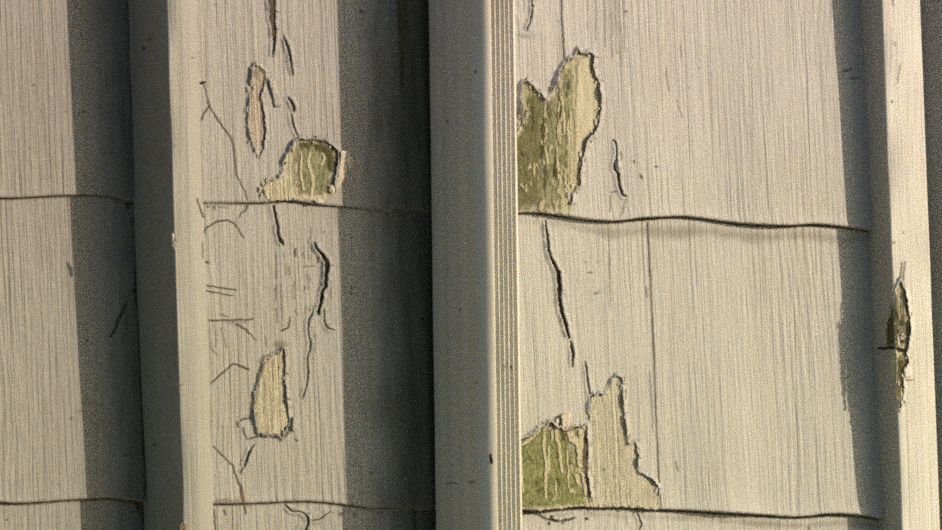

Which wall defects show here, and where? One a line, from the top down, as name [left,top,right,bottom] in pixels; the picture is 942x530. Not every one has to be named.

peeling [245,60,282,159]
crack [197,81,336,400]
peeling [259,134,353,203]
peeling [516,45,606,215]
peeling [236,346,298,475]
crack [540,220,606,420]
peeling [521,372,663,525]
peeling [892,276,915,414]